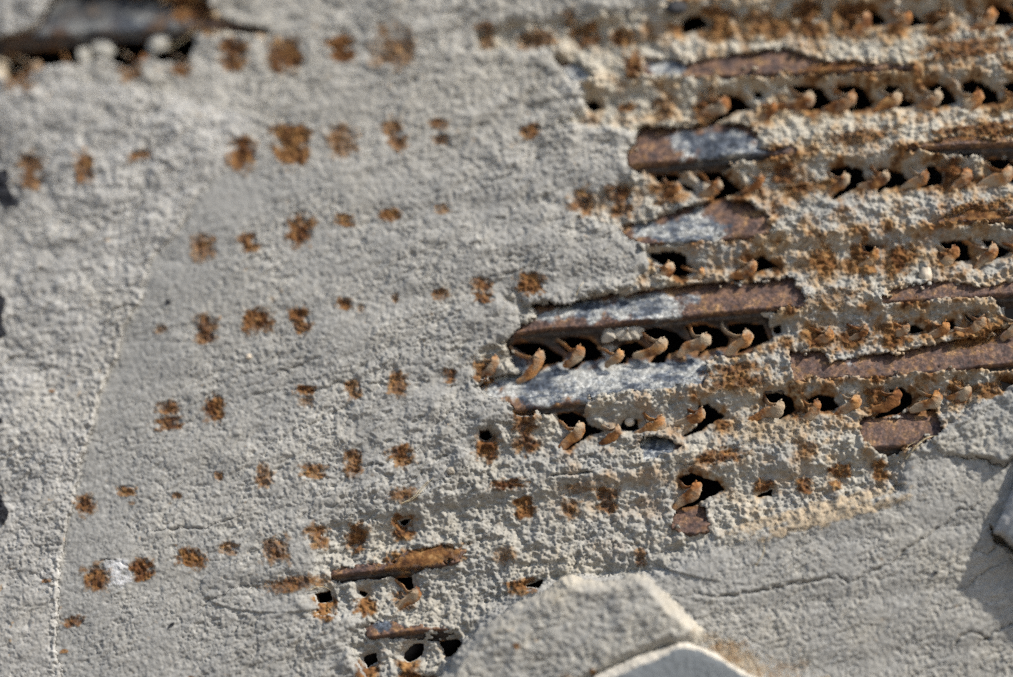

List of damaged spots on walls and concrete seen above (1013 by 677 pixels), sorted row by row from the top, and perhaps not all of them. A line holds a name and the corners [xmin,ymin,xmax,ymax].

peeling [0,0,51,39]
flaking render [161,0,277,41]
rust [701,0,865,41]
flaking render [147,33,169,55]
rust [515,10,642,79]
rust [268,123,313,165]
peeling [0,39,254,677]
flaking render [304,0,1013,677]
rust [490,478,537,520]
crack [670,498,983,597]
rust [129,557,156,582]
crack [914,623,1013,676]